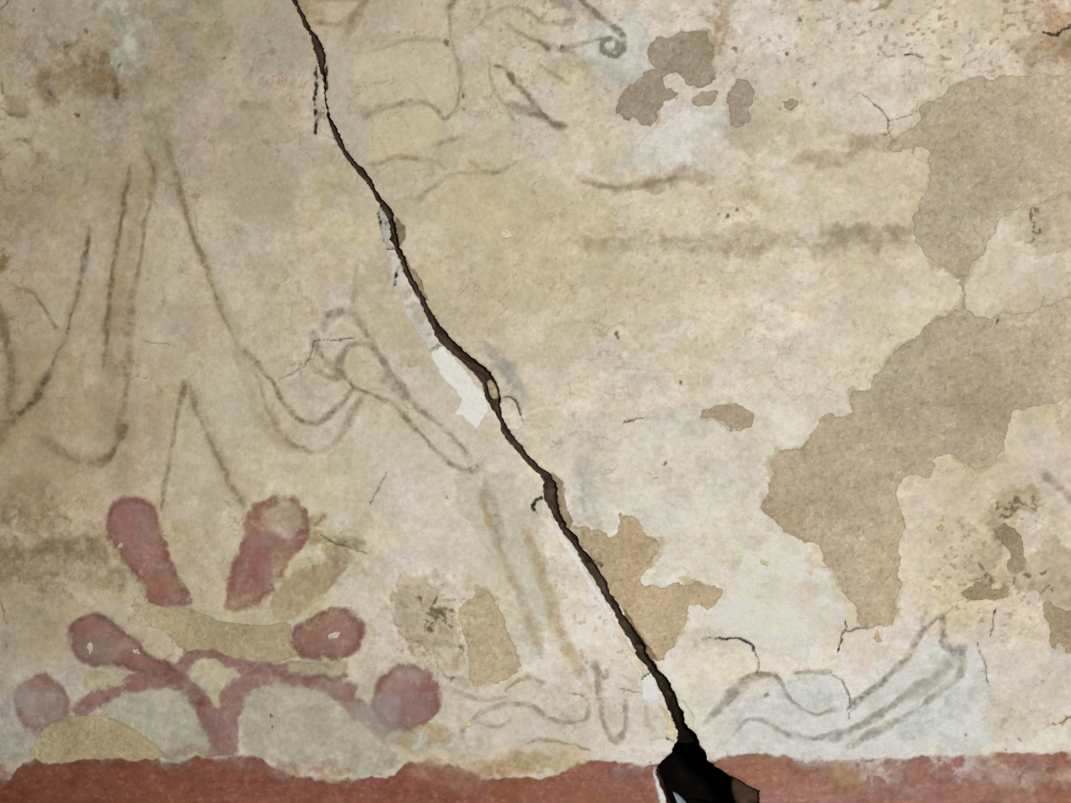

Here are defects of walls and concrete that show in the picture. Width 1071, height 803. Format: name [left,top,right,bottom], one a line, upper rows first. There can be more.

spalling [616,29,754,127]
crack [292,0,701,747]
spalling [700,404,754,431]
spalling [761,70,1071,653]
spalling [397,574,521,687]
spalling [571,514,723,660]
crack [708,637,755,653]